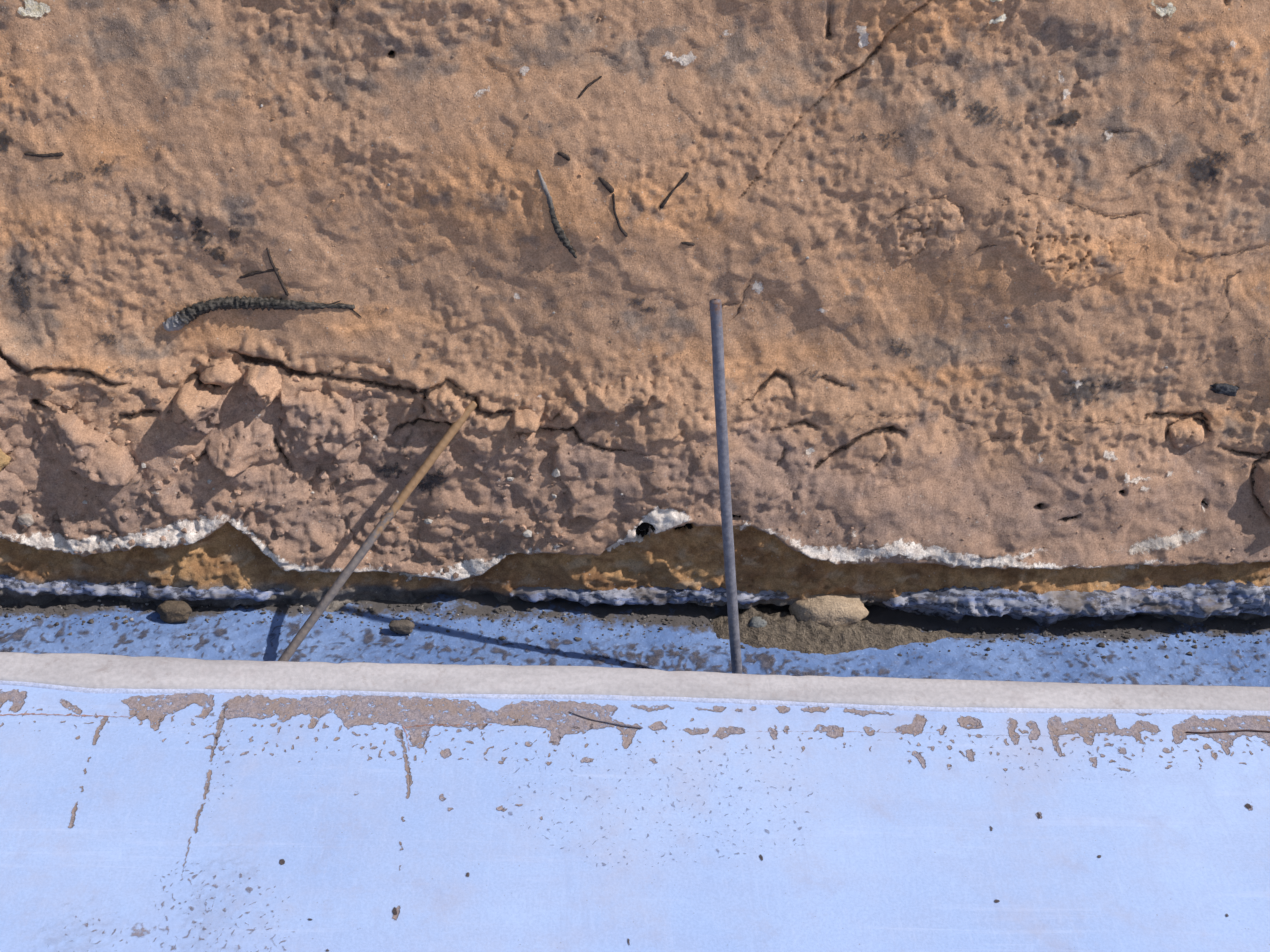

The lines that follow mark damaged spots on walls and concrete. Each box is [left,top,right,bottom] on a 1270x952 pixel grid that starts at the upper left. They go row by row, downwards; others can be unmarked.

crack [814,9,919,105]
crack [0,352,159,419]
crack [228,350,513,430]
crack [542,426,646,456]
crack [753,373,816,459]
crack [816,377,913,468]
spalling [0,619,93,654]
spalling [110,618,161,656]
spalling [174,619,250,660]
spalling [252,620,890,676]
peeling [0,689,47,731]
peeling [60,693,1270,771]